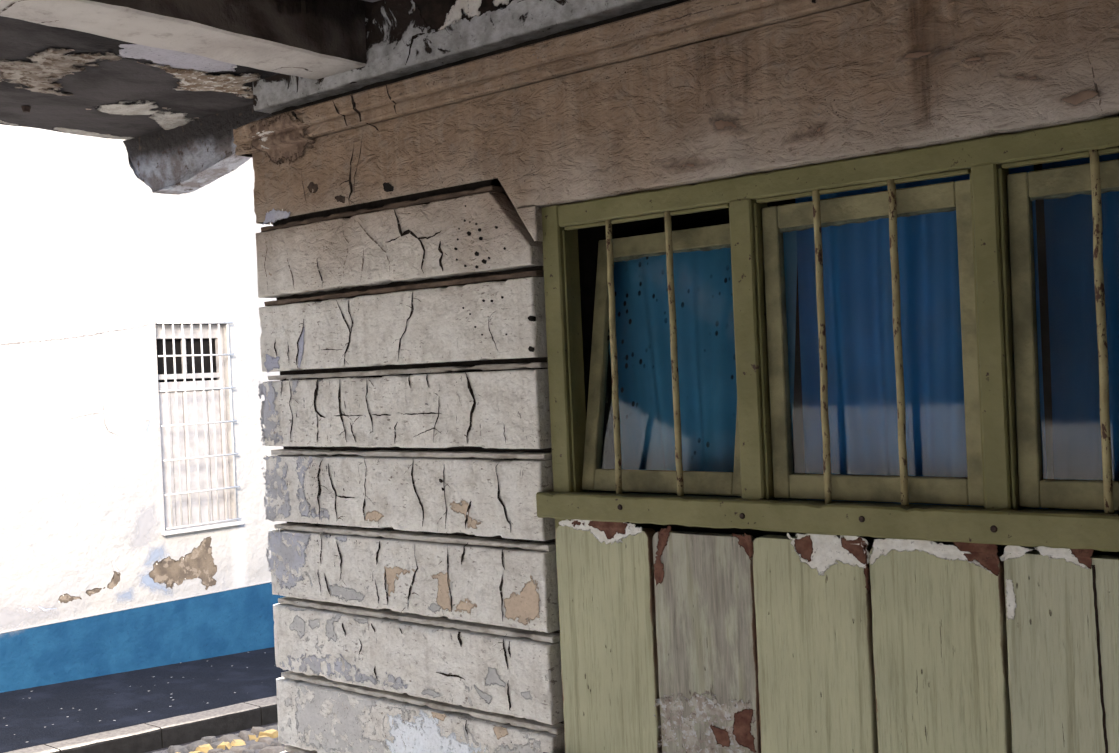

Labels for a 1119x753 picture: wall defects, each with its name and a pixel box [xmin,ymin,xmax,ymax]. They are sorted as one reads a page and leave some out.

peeling [413,0,513,32]
crack [405,33,425,65]
spalling [0,44,261,99]
spalling [86,100,198,130]
crack [264,85,513,710]
peeling [258,327,352,589]
peeling [558,519,642,544]
peeling [149,536,217,590]
peeling [787,533,993,576]
peeling [999,545,1089,569]
peeling [22,560,121,612]
peeling [1005,579,1017,620]